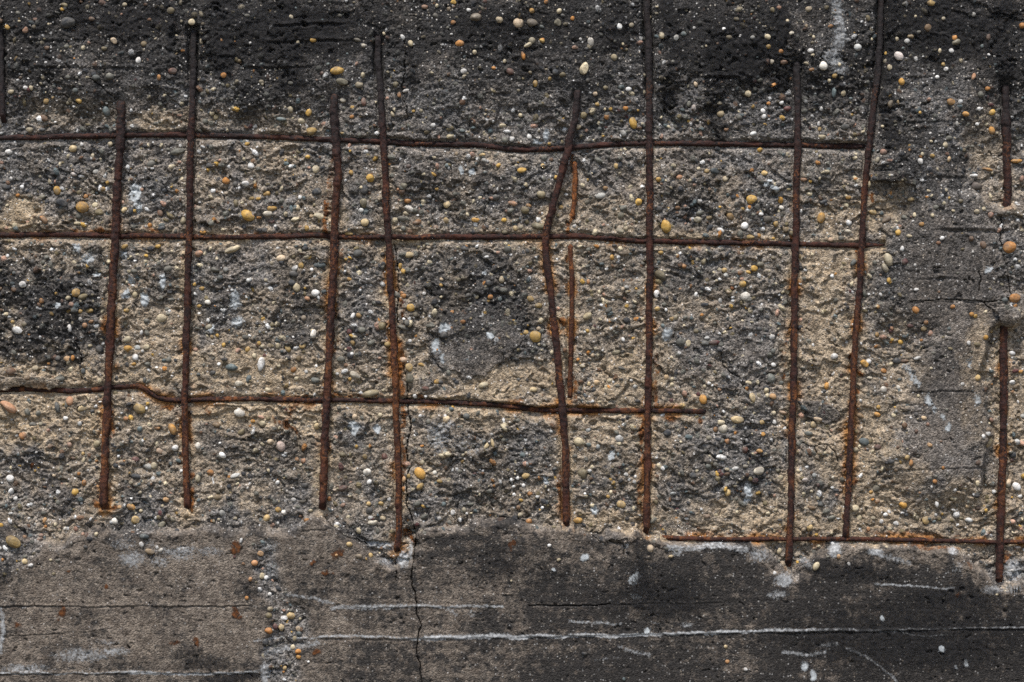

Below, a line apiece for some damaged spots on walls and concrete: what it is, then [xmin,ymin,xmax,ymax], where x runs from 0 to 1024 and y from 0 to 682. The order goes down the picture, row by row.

damp [68,0,184,50]
damp [203,0,381,92]
damp [449,2,569,78]
damp [602,0,637,52]
damp [656,0,804,149]
damp [824,0,846,72]
damp [877,0,1023,150]
rust [322,179,331,233]
spalling [0,0,878,577]
spalling [764,49,1024,591]
rust [398,341,423,476]
damp [85,530,1024,682]